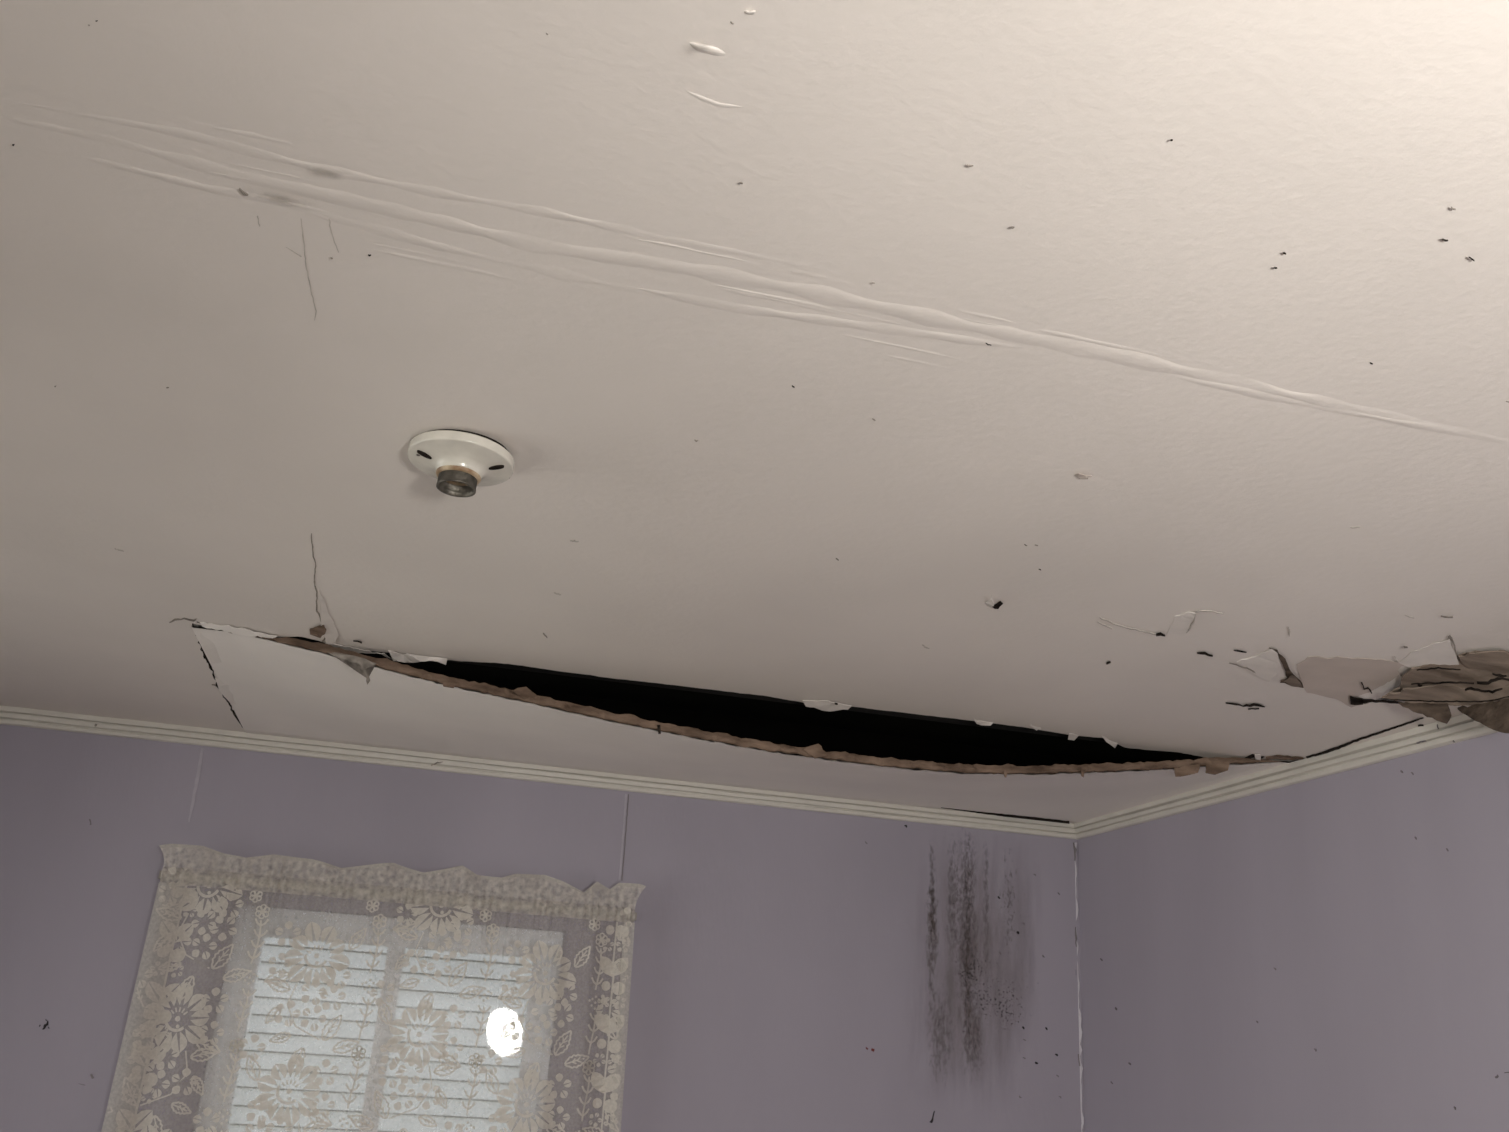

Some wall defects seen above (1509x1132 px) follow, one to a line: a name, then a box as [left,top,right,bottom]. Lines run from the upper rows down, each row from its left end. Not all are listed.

crack [169,533,339,728]
peeling [1197,615,1509,744]